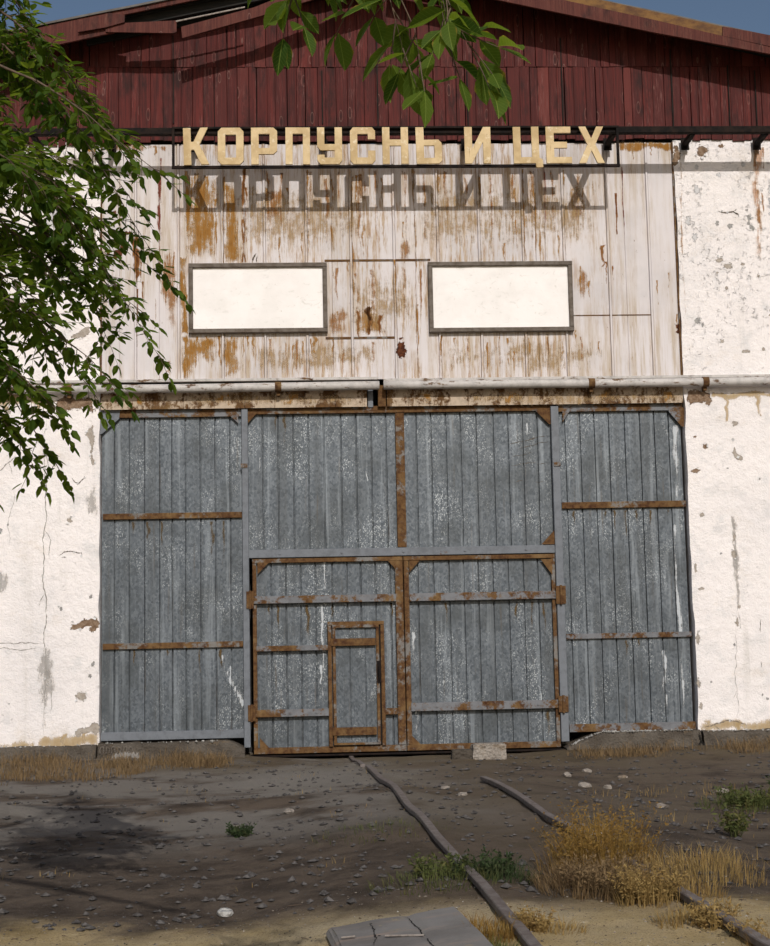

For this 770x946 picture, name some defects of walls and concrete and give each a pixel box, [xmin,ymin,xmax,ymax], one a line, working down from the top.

rust [88,144,165,230]
rust [614,168,625,234]
spalling [672,144,724,169]
rust [753,148,764,229]
rust [107,231,144,318]
rust [155,169,600,378]
spalling [56,395,96,412]
spalling [687,389,712,407]
spalling [85,425,96,465]
crack [0,459,82,731]
spalling [70,616,100,632]